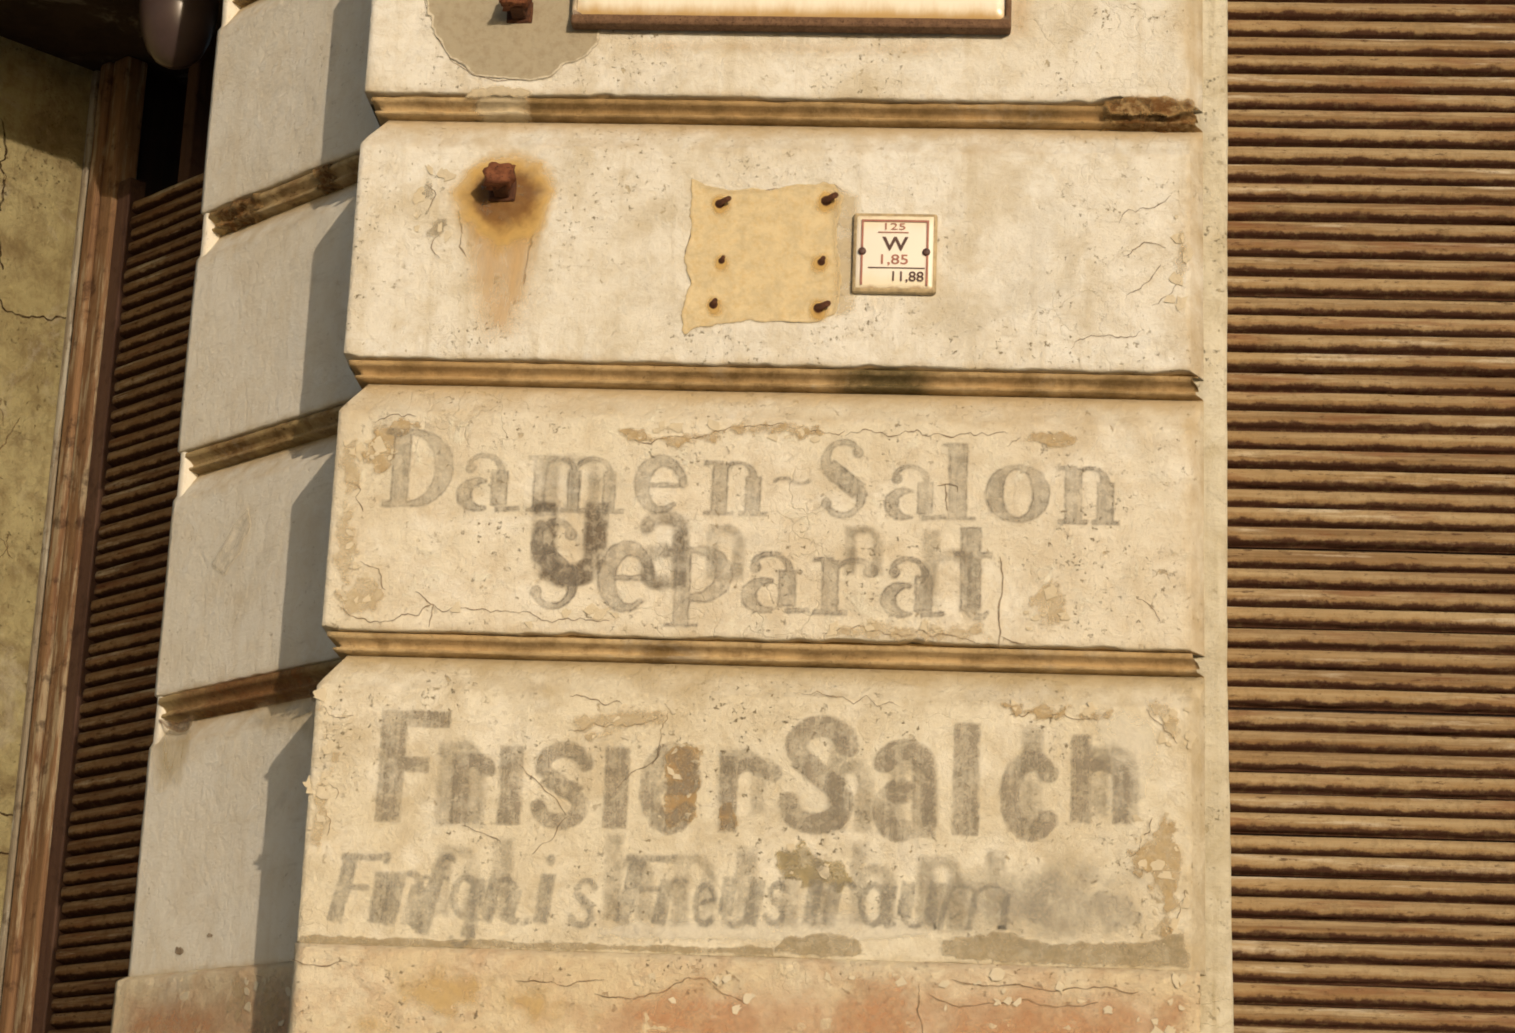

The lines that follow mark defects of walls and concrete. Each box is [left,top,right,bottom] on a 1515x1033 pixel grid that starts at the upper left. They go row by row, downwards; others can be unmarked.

crack [0,119,66,321]
corrosion [453,158,553,325]
peeling [1126,812,1190,945]
peeling [597,972,756,1033]
peeling [848,968,1187,1033]